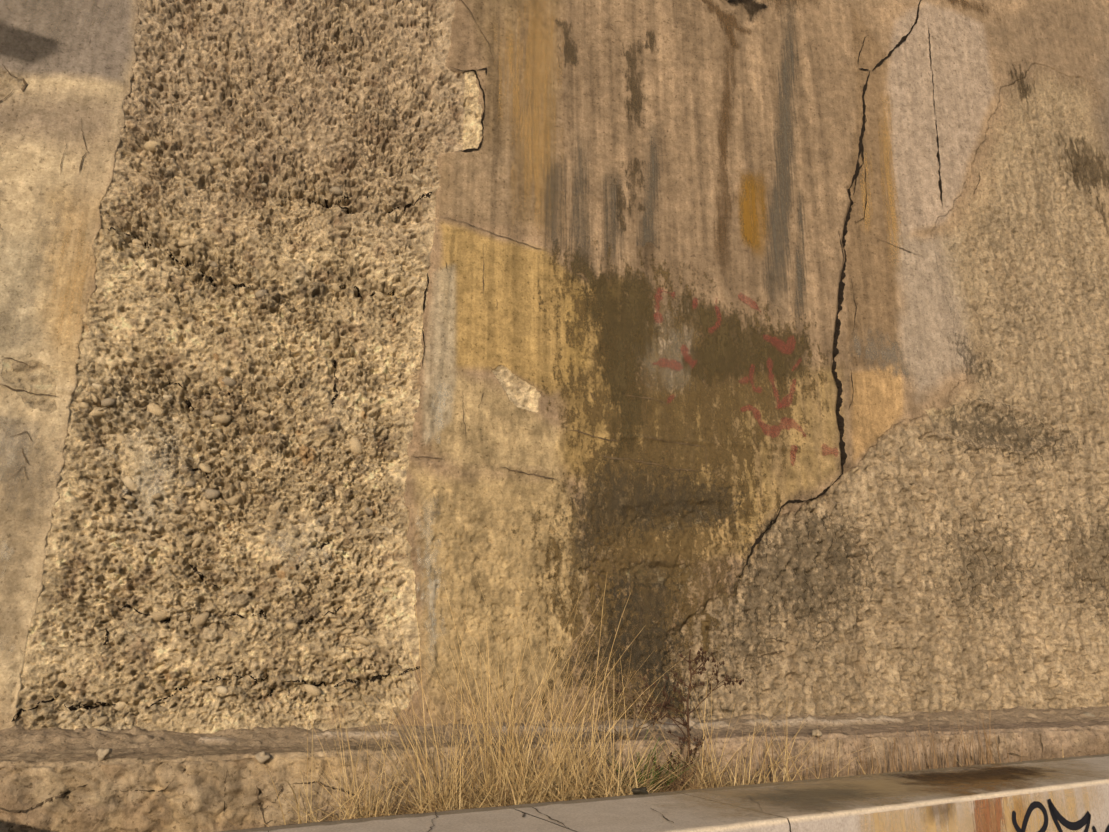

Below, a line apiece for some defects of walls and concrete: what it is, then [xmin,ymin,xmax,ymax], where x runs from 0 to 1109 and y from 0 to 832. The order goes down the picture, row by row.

water stain [556,21,577,66]
water stain [702,0,778,49]
crack [0,65,27,102]
water stain [1010,66,1035,103]
water stain [1058,138,1109,234]
crack [738,0,943,581]
crack [1,357,59,398]
spalling [2,0,484,734]
water stain [526,29,831,721]
spalling [661,64,1109,720]
water stain [898,767,1038,781]